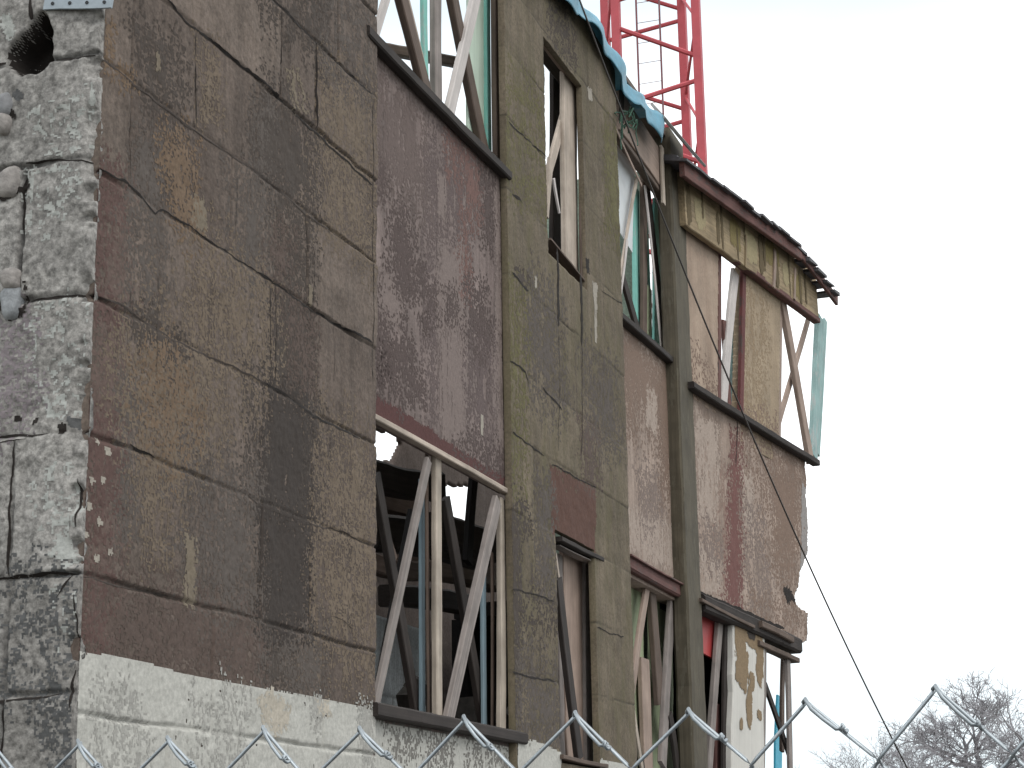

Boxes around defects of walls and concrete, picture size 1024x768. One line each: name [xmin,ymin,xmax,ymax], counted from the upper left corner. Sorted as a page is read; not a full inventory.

spalling [0,12,55,77]
leakage [160,0,560,768]
rust [712,423,748,609]
spalling [800,483,808,570]
crack [0,433,167,767]
spalling [783,586,796,605]
peeling [256,686,291,739]
peeling [735,626,764,731]